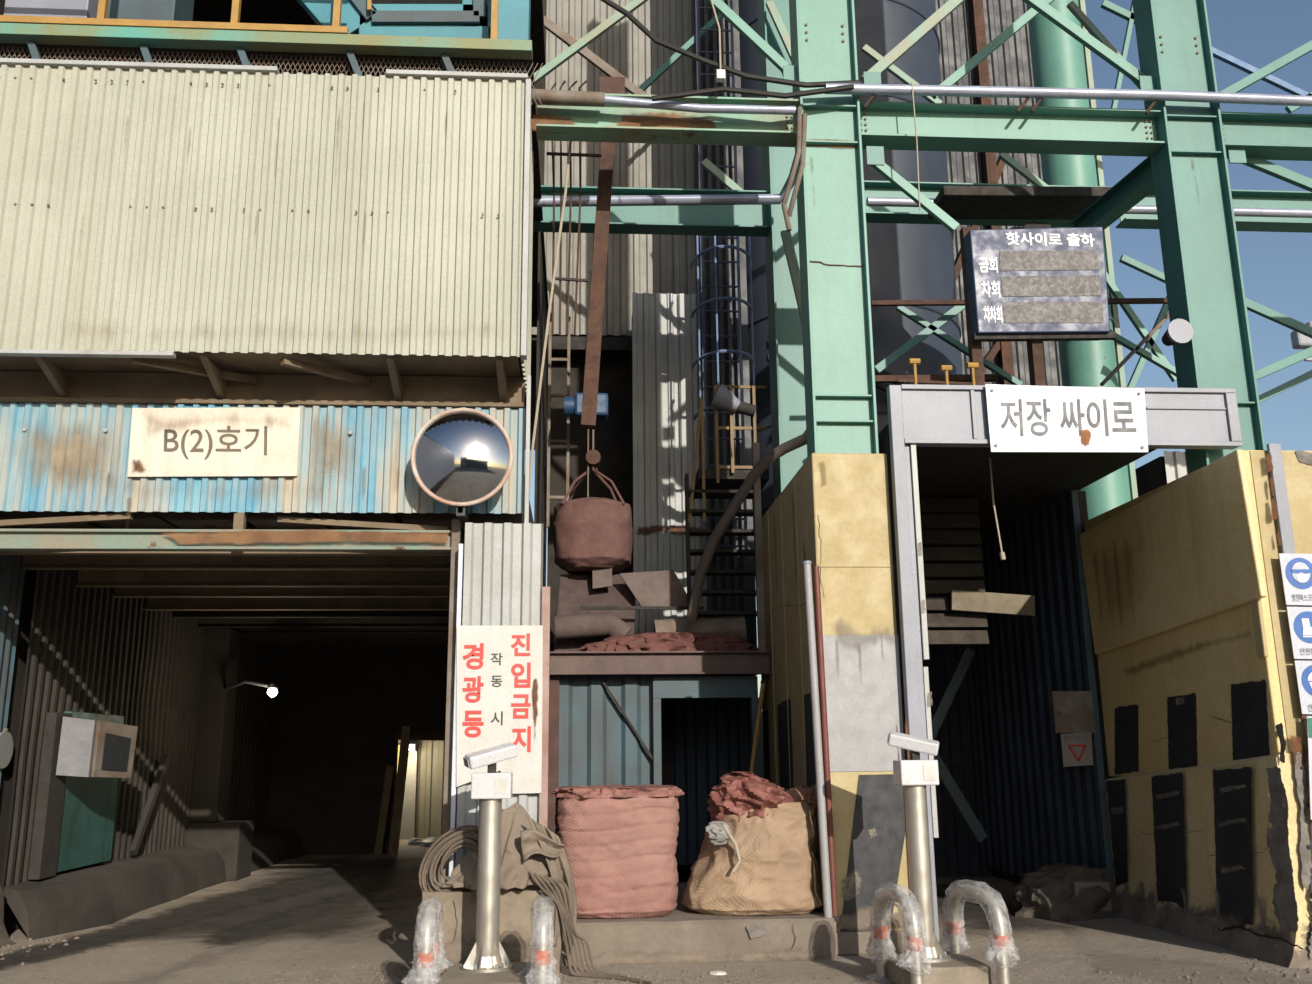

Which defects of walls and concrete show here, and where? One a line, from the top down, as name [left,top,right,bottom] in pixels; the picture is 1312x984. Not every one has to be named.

rust [531,115,575,133]
rust [618,112,716,129]
rust [638,525,702,537]
spalling [1266,723,1312,959]